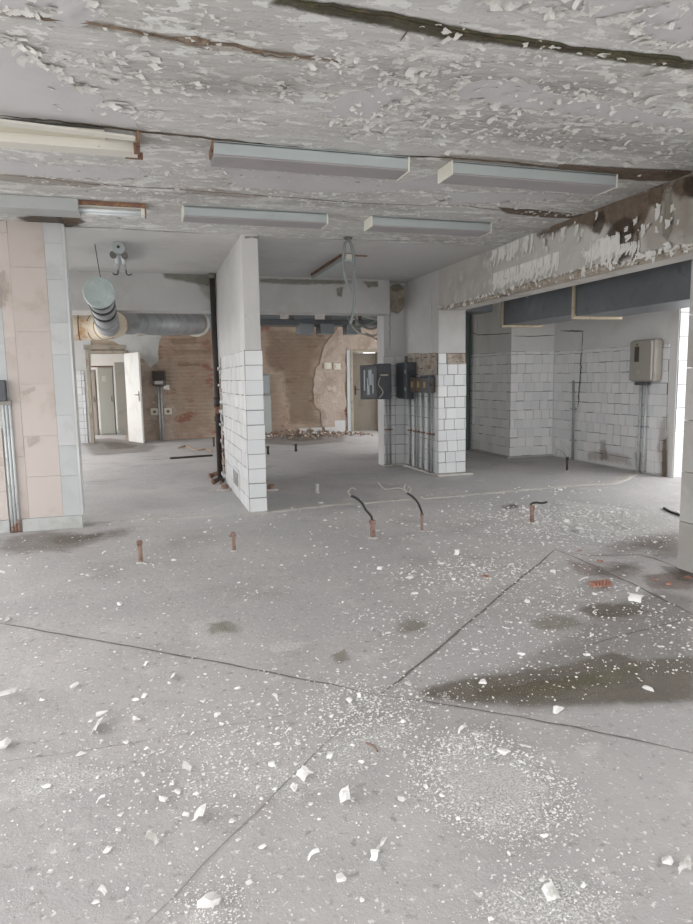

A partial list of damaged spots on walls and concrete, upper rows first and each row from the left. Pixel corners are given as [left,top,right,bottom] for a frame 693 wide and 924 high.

crack [5,11,338,62]
crack [273,0,693,69]
peeling [0,0,693,172]
peeling [0,150,475,217]
crack [450,205,583,218]
spalling [437,183,693,312]
damp [538,175,693,261]
spalling [299,420,345,434]
damp [584,605,639,616]
damp [429,655,692,703]
crack [1,549,692,918]